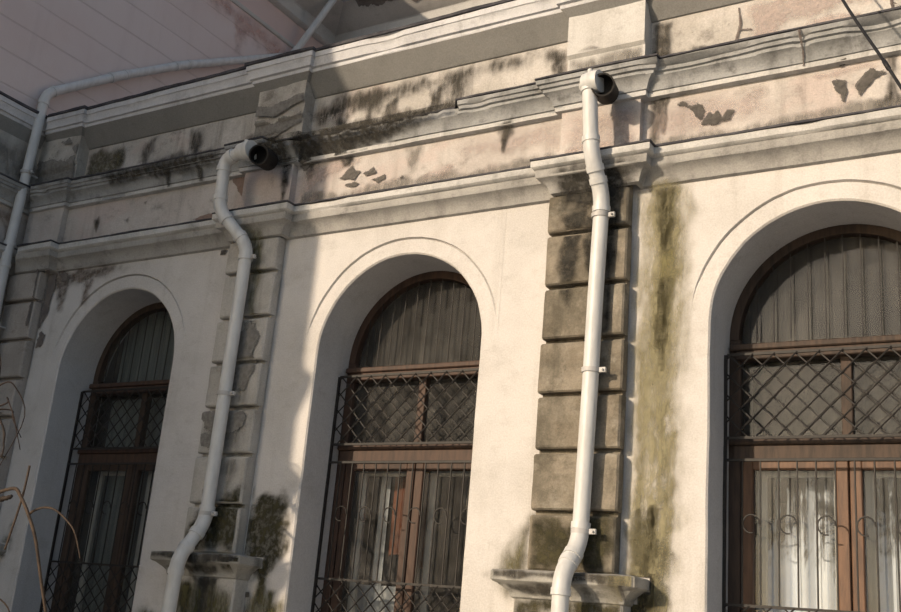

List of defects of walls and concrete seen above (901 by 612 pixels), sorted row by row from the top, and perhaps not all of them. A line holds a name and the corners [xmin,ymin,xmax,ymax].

damp [549,52,565,74]
flaking render [832,68,887,102]
damp [87,132,216,186]
flaking render [298,159,386,201]
damp [250,69,470,199]
damp [470,159,530,175]
damp [501,121,512,150]
flaking render [677,101,735,126]
damp [558,165,593,299]
damp [569,160,680,612]
damp [257,559,273,612]
damp [494,518,571,612]